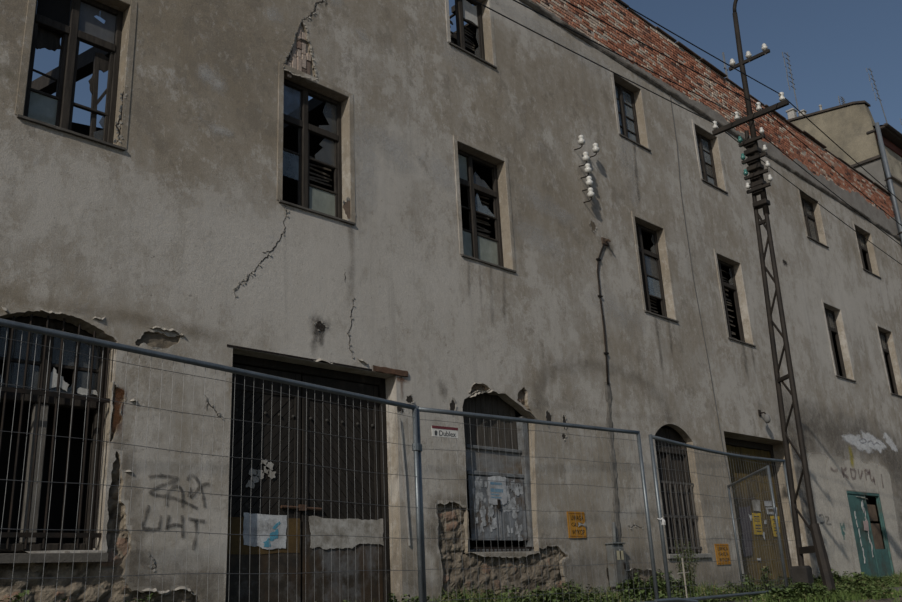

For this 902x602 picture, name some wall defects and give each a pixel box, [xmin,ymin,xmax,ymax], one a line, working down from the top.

spalling [0,454,196,602]